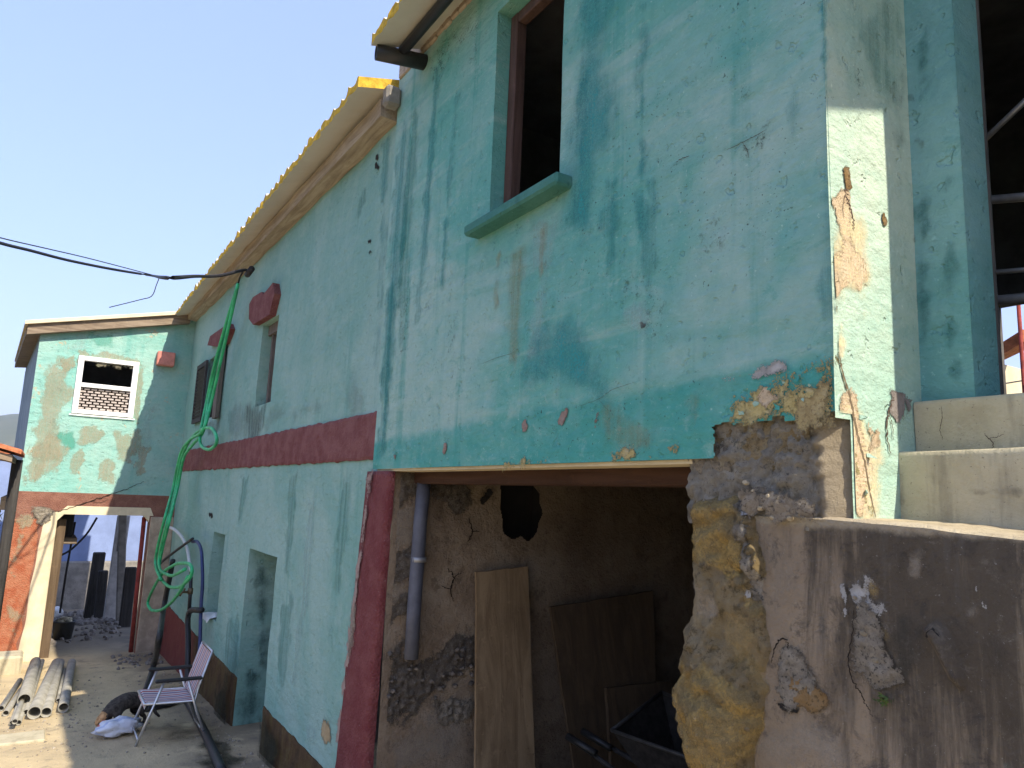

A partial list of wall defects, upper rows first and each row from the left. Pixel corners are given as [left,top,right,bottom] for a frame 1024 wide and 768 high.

peeling [832,166,869,310]
peeling [29,350,150,483]
spalling [399,472,417,509]
spalling [386,541,475,727]
crack [442,569,461,598]
spalling [431,484,543,541]
spalling [692,444,732,475]
spalling [731,480,816,603]
spalling [775,645,830,714]
peeling [727,355,881,518]
spalling [840,575,905,717]
peeling [890,387,912,424]